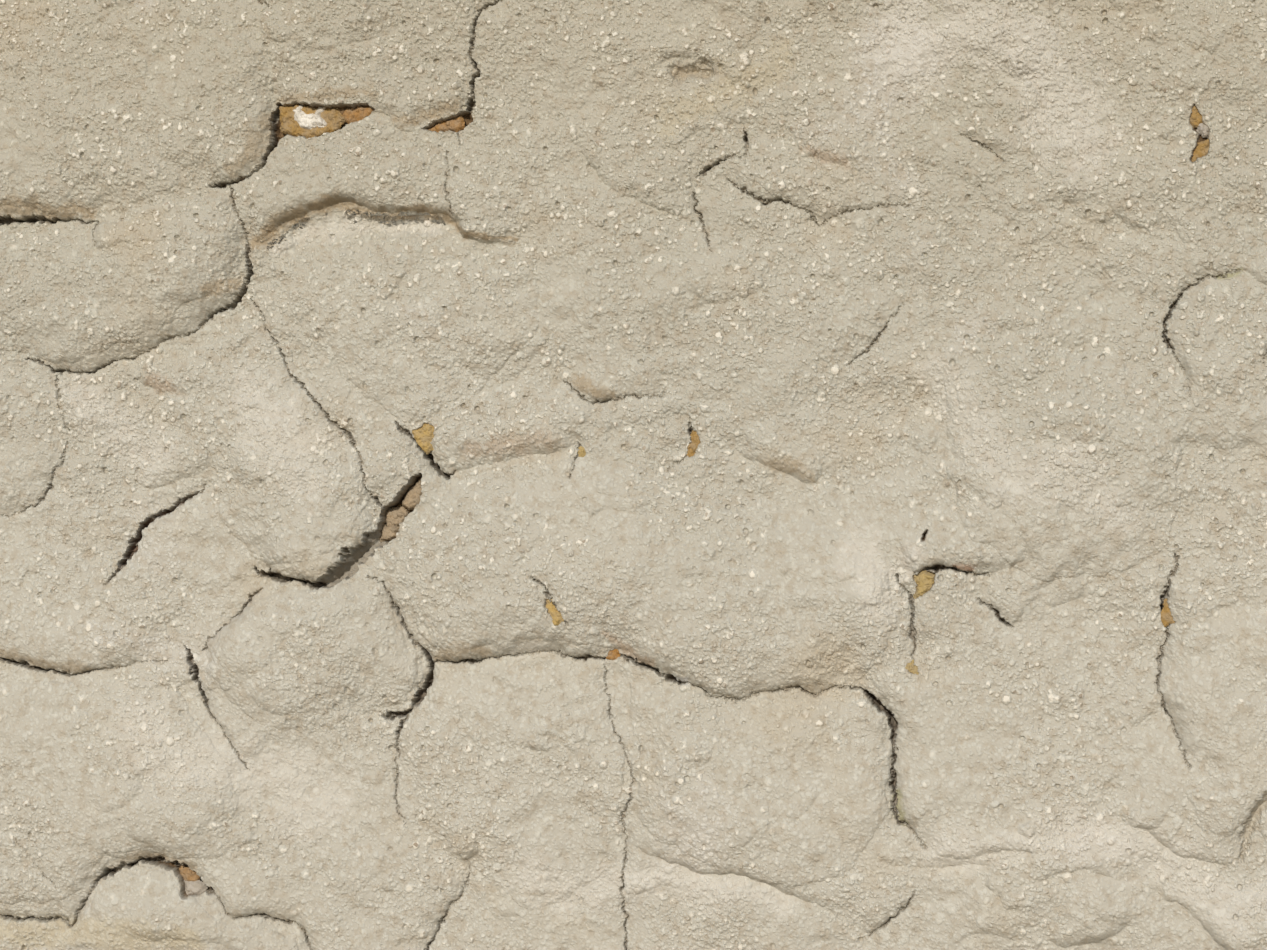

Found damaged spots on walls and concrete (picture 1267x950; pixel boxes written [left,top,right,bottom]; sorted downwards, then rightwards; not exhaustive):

spalling [270,101,376,146]
crack [444,0,503,216]
crack [957,132,1007,164]
spalling [1188,103,1211,164]
crack [1162,270,1242,399]
spalling [412,422,435,454]
spalling [375,472,423,545]
crack [0,103,927,950]
spalling [913,569,936,601]
crack [894,564,1014,660]
crack [1153,553,1192,769]
crack [1235,791,1267,865]